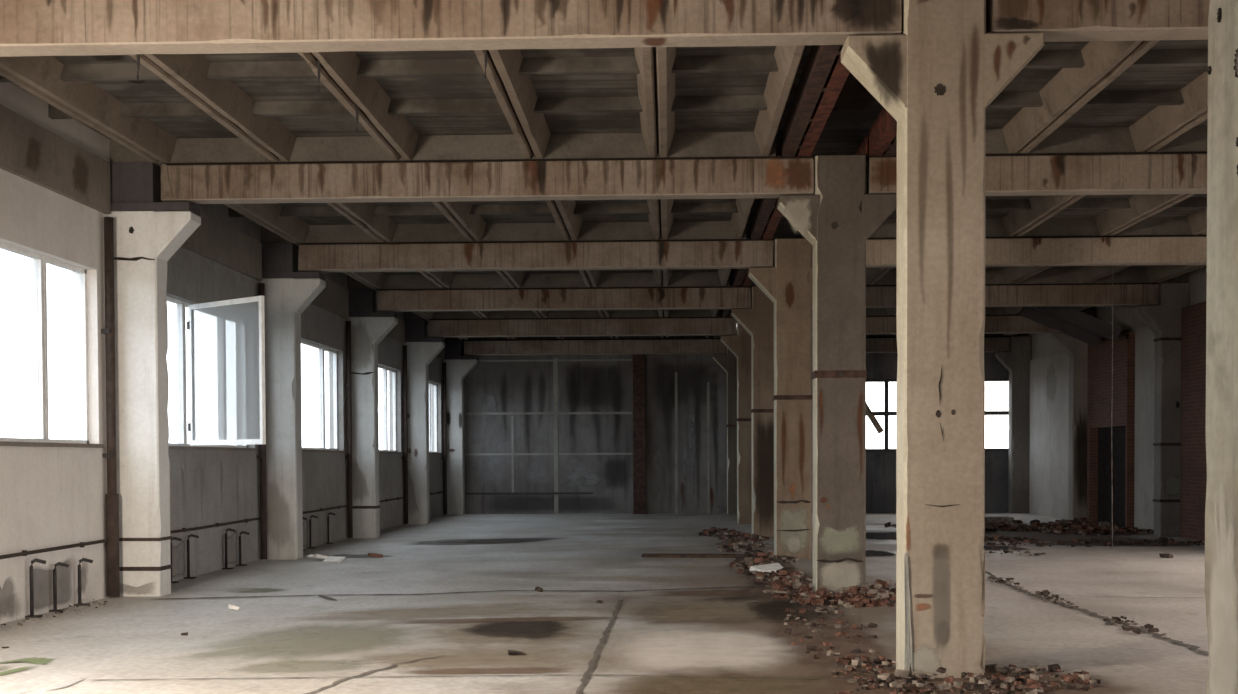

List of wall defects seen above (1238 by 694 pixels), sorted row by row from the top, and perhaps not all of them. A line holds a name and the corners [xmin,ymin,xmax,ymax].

rust [644,0,676,46]
rust [723,0,745,21]
damp [776,0,896,28]
damp [834,43,901,108]
rust [766,159,811,189]
rust [782,415,804,496]
damp [0,579,14,615]